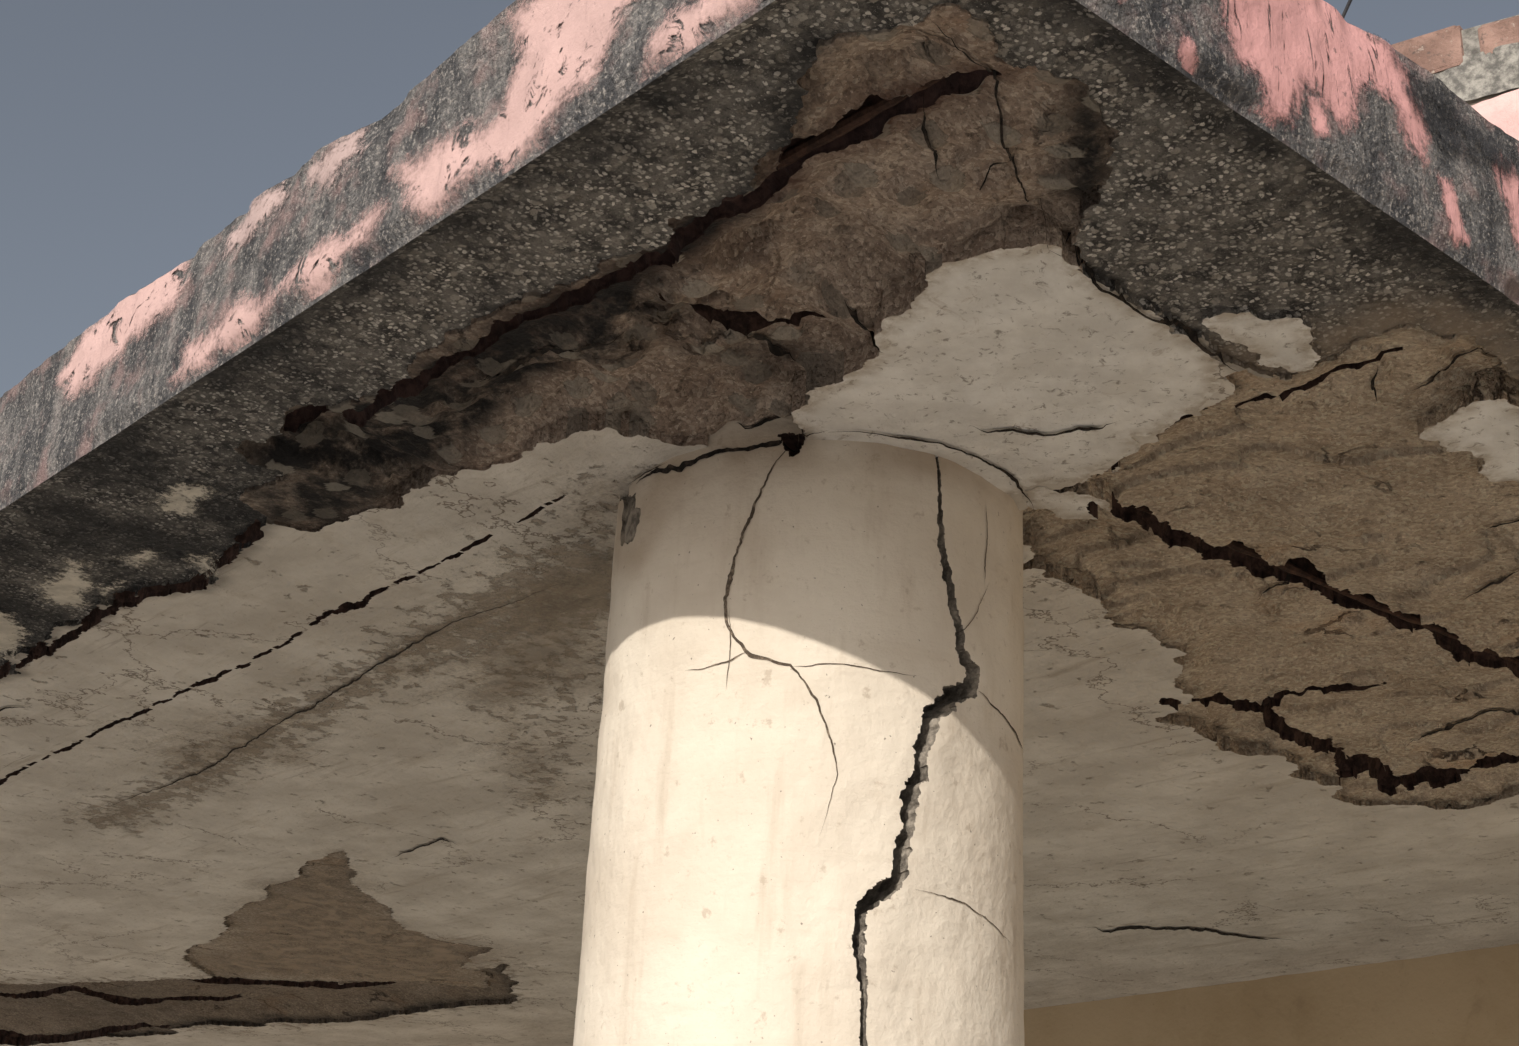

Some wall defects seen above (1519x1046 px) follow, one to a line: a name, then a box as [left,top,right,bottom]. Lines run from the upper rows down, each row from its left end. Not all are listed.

spalling [172,0,1121,532]
peeling [1440,177,1469,246]
peeling [1494,160,1519,243]
crack [0,495,591,808]
peeling [620,493,641,546]
crack [629,415,1115,1046]
spalling [1023,324,1519,810]
spalling [0,851,519,1046]
crack [392,838,450,858]
crack [1087,926,1295,941]